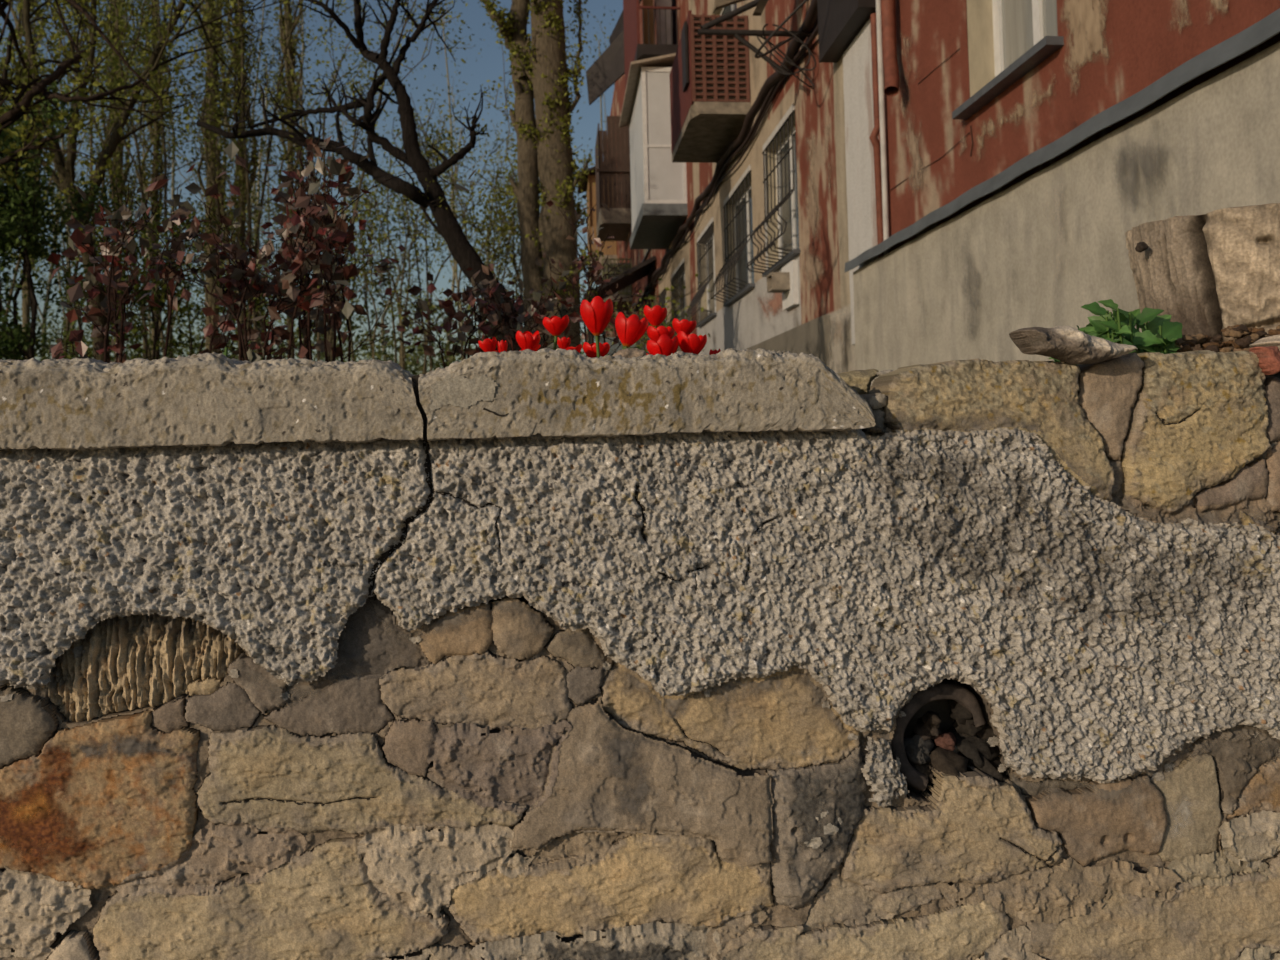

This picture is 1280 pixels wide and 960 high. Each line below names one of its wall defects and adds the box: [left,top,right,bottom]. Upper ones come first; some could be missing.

peeling [1061,0,1108,86]
peeling [960,85,1051,155]
crack [368,374,502,601]
crack [635,484,646,541]
spalling [864,413,1280,540]
crack [657,567,704,591]
spalling [0,590,1280,803]
rust [0,746,94,873]
damp [545,939,692,960]